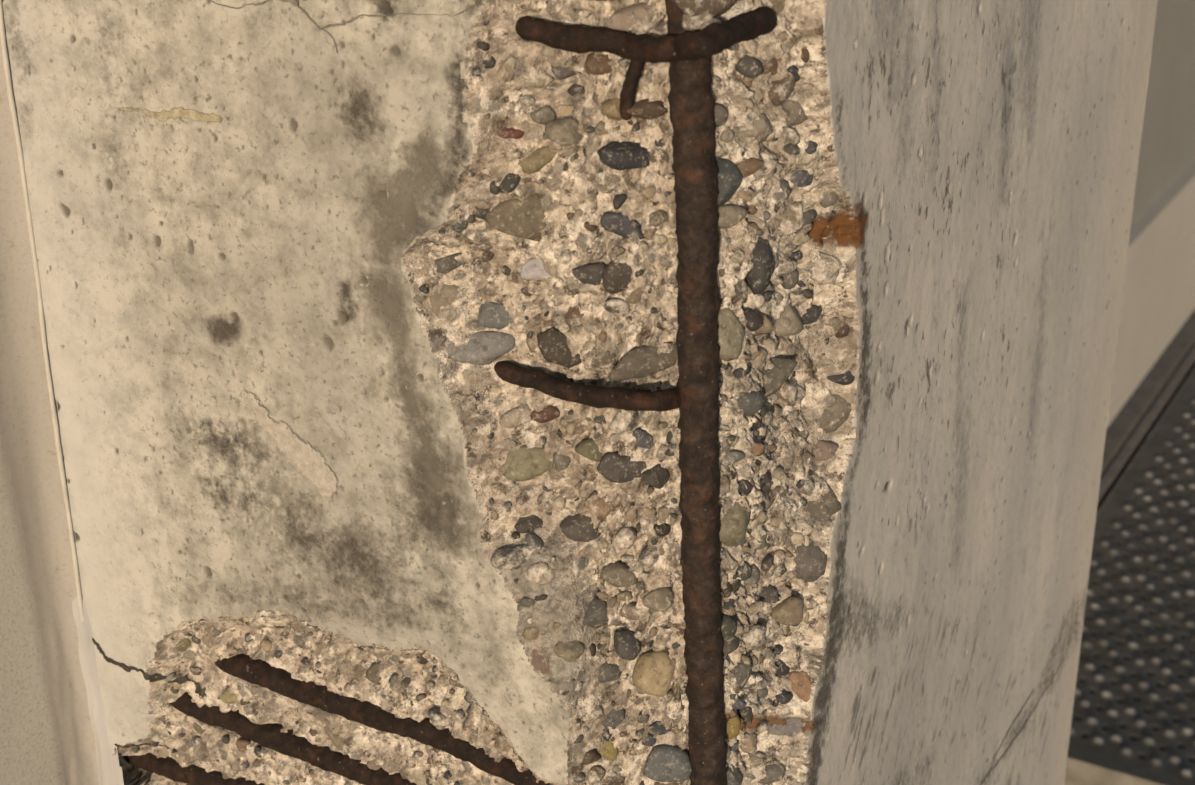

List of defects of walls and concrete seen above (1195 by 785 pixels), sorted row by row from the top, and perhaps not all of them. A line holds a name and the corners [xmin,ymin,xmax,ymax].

crack [209,0,483,53]
damp [347,91,376,139]
corrosion [807,203,868,247]
damp [342,283,353,320]
damp [364,61,469,548]
damp [208,319,239,343]
spalling [112,0,862,785]
damp [205,422,263,459]
damp [206,479,255,510]
damp [286,501,384,597]
crack [92,638,206,697]
corrosion [724,716,821,730]